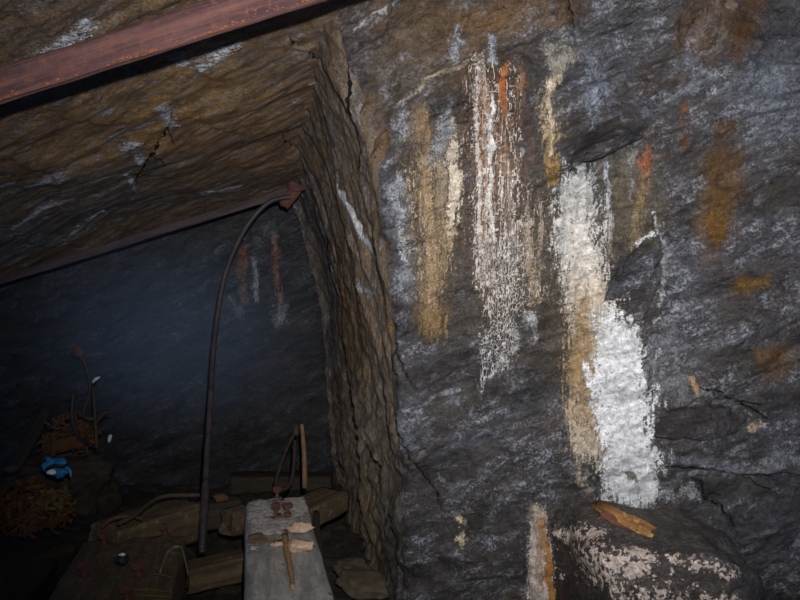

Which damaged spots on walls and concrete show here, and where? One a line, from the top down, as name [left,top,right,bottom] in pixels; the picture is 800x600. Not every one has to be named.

rust [191,7,287,40]
crack [132,105,175,196]
crack [345,62,361,172]
rust [498,58,525,118]
rust [589,133,671,268]
rust [694,114,749,250]
leakage [332,220,373,387]
leakage [380,24,800,509]
crack [699,387,769,419]
crack [647,460,798,536]